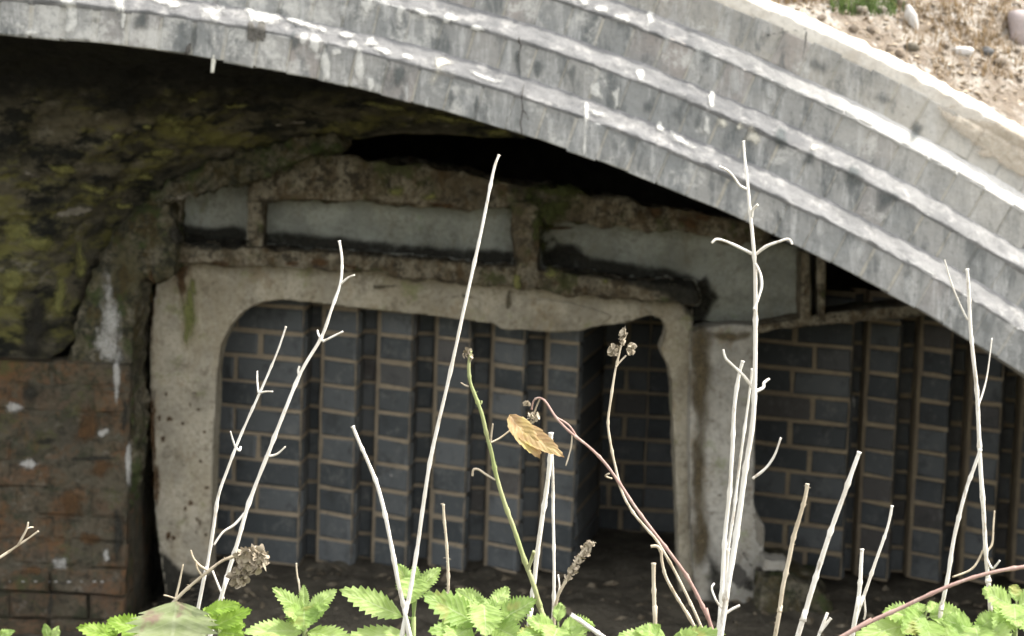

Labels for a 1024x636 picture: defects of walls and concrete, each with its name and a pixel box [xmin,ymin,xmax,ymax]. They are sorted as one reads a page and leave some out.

crack [518,37,527,135]
leakage [56,206,92,217]